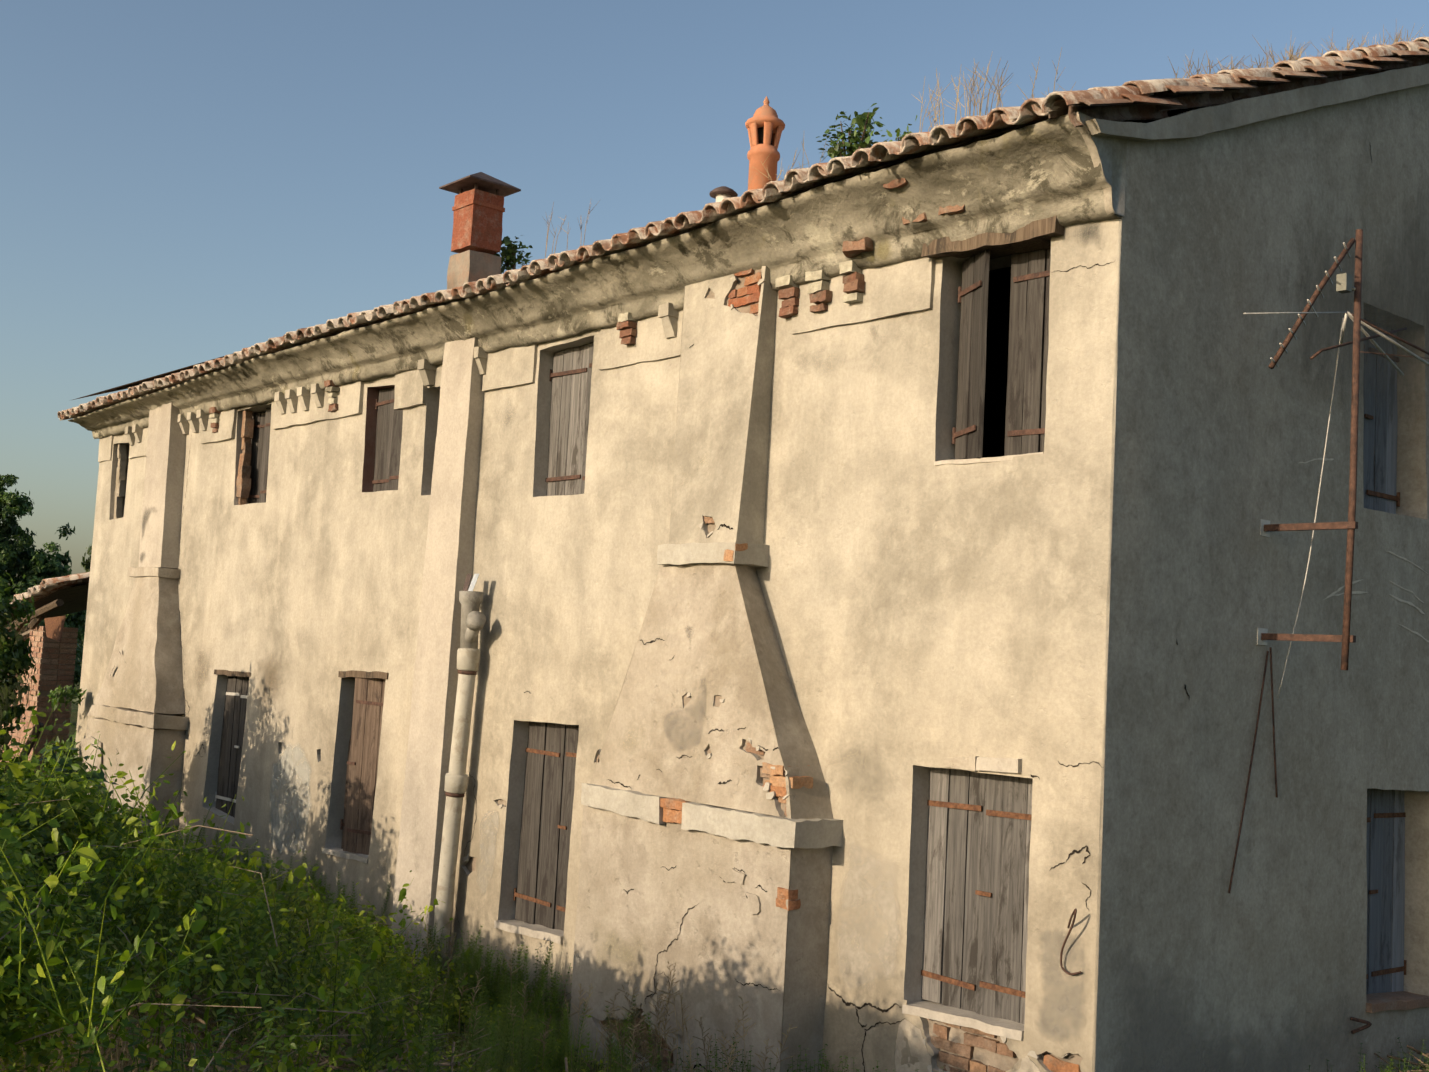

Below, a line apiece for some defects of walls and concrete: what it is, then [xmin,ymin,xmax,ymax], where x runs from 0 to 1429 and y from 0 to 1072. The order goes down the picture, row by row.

spalling [706,269,766,316]
spalling [743,738,813,817]
crack [1050,845,1091,910]
crack [645,904,698,1016]
crack [826,980,907,1072]
spalling [895,1018,1083,1072]